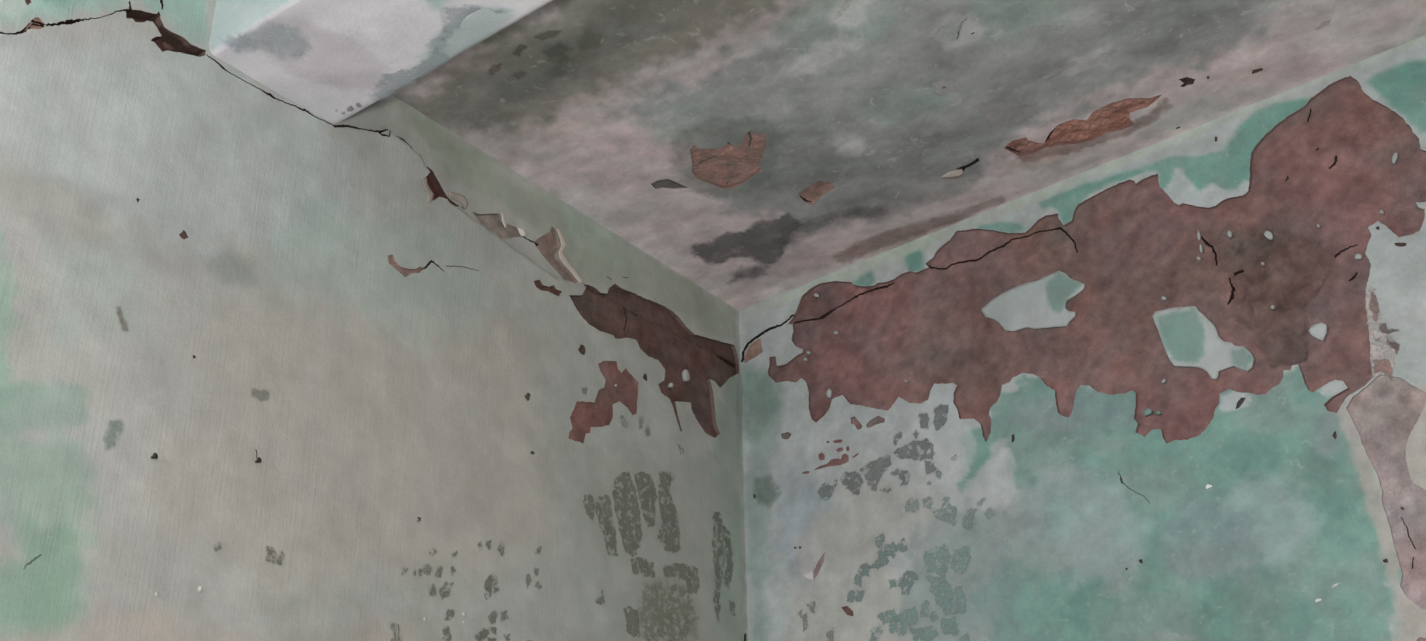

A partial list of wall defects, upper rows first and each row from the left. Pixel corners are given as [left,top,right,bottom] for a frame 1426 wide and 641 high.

crack [0,0,164,35]
flaking render [422,76,1426,609]
peeling [402,550,457,641]
peeling [475,575,510,641]
peeling [583,472,735,641]
peeling [841,534,971,641]